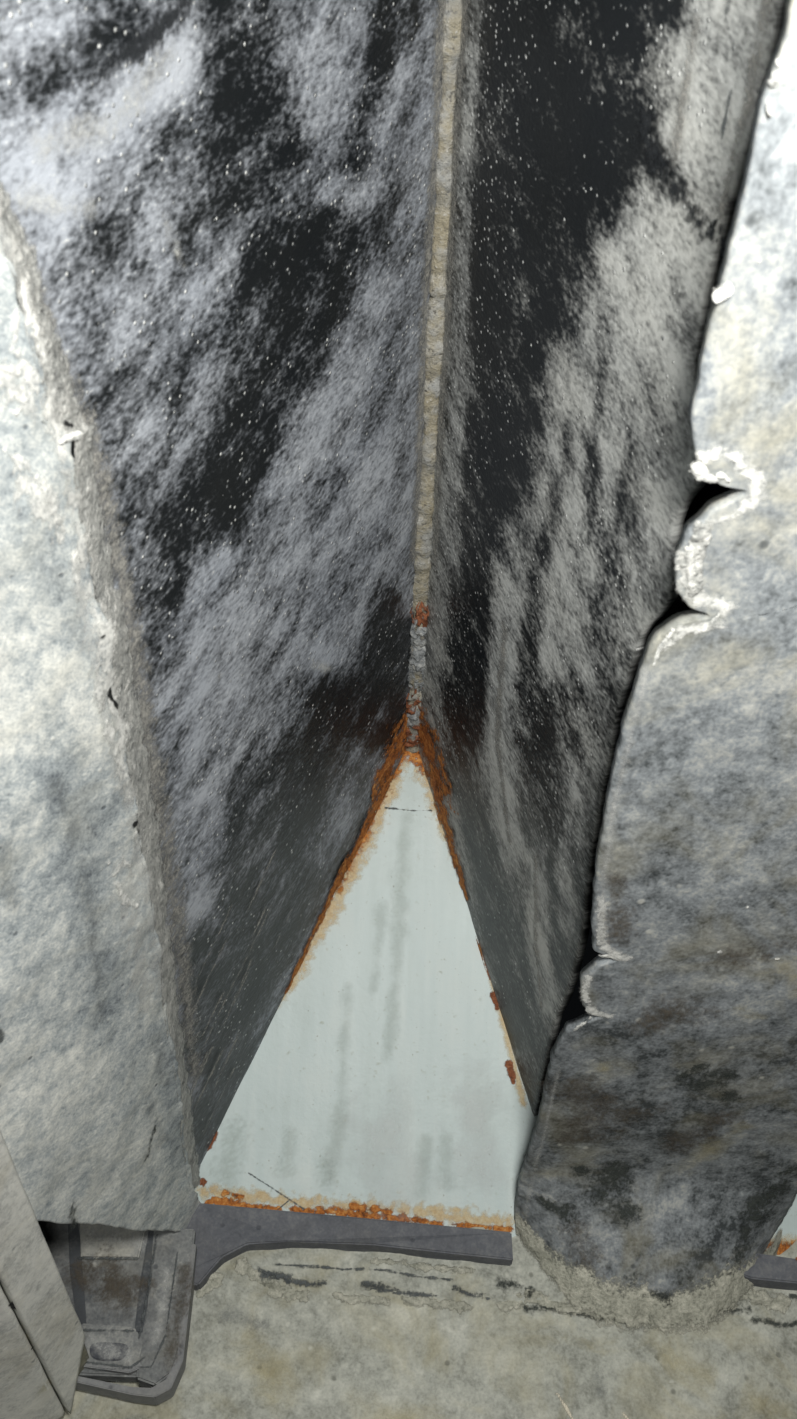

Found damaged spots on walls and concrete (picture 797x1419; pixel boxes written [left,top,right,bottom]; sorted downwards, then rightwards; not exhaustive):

rust [410,602,429,627]
rust [283,689,468,998]
rust [476,939,525,1105]
water stain [669,1064,738,1150]
rust [198,1178,513,1232]
water stain [536,1196,590,1269]
water stain [571,1160,642,1225]
water stain [732,1162,797,1263]
water stain [626,1272,678,1307]